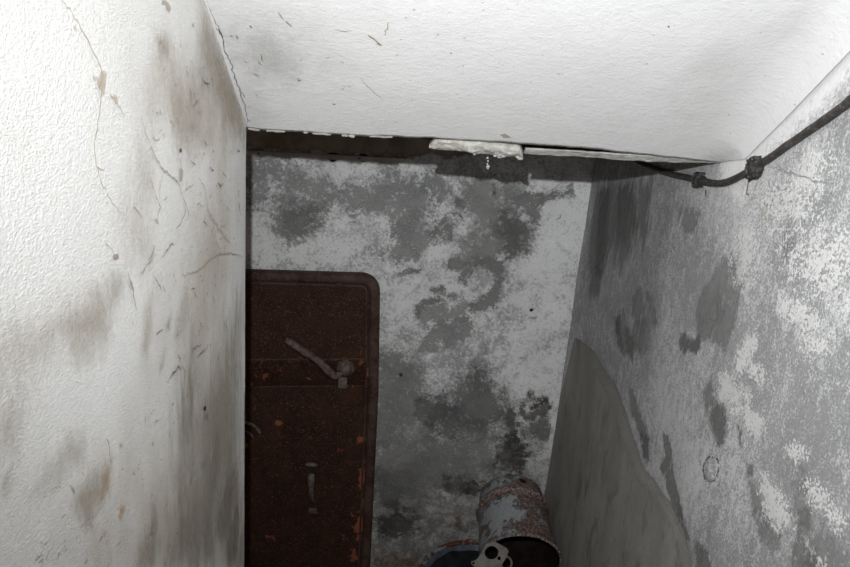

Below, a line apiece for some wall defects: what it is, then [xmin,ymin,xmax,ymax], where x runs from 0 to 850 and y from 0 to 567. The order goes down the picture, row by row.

crack [209,8,250,126]
crack [62,0,241,322]
spalling [429,134,715,163]
damp [454,175,539,268]
damp [588,176,653,298]
damp [614,288,657,360]
damp [679,259,741,355]
damp [373,349,551,543]
damp [694,542,711,567]